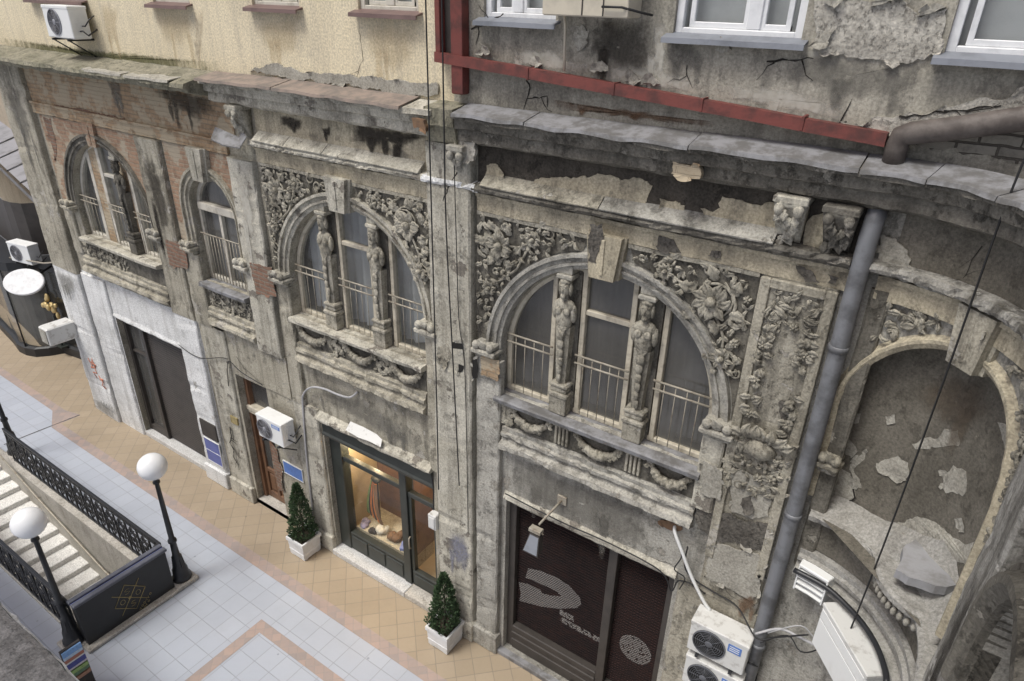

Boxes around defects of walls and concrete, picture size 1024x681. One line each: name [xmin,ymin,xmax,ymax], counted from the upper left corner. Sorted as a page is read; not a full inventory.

spalling [808,0,948,69]
crack [762,57,814,80]
water stain [162,90,207,128]
crack [523,80,552,112]
water stain [355,126,422,158]
flaking render [671,162,704,182]
peeling [534,173,685,211]
peeling [701,196,775,228]
peeling [912,429,960,449]
peeling [833,439,909,500]
peeling [938,465,967,496]
peeling [897,516,975,564]